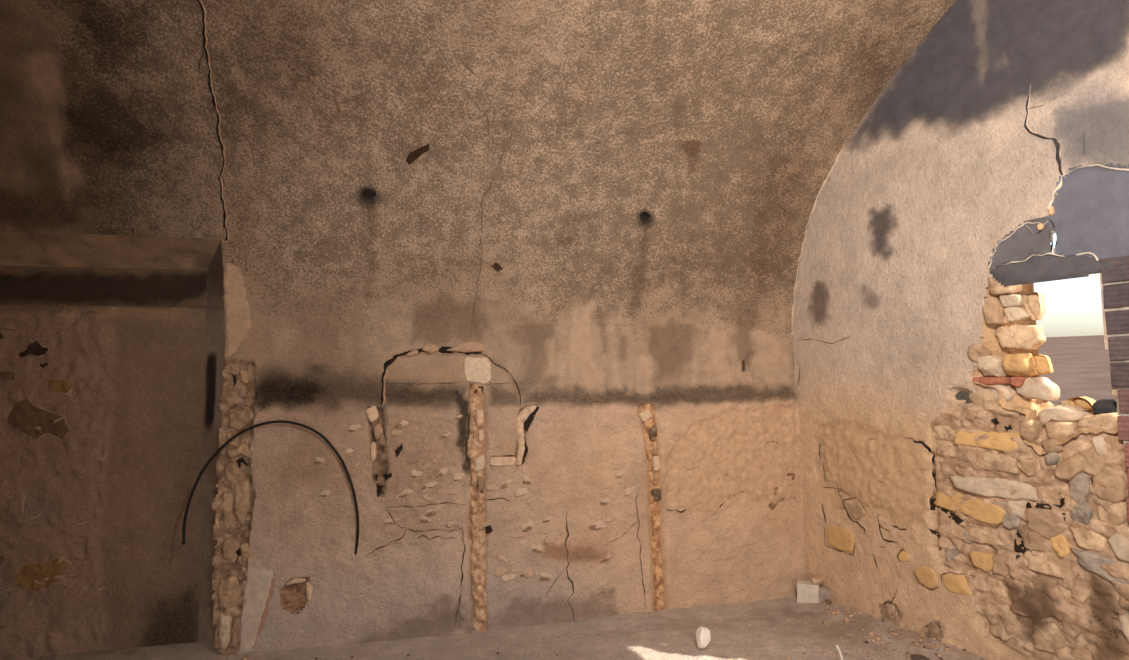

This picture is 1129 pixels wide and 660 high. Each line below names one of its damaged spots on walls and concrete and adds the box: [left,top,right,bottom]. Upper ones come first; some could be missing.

crack [197,0,229,241]
crack [1024,85,1085,177]
flaking render [988,163,1129,268]
peeling [8,399,71,440]
peeling [19,341,74,395]
spalling [947,385,975,403]
peeling [13,556,72,591]
spalling [212,359,312,655]
crack [365,502,466,628]
crack [546,511,575,621]
flaking render [824,526,855,555]
flaking render [897,549,975,597]